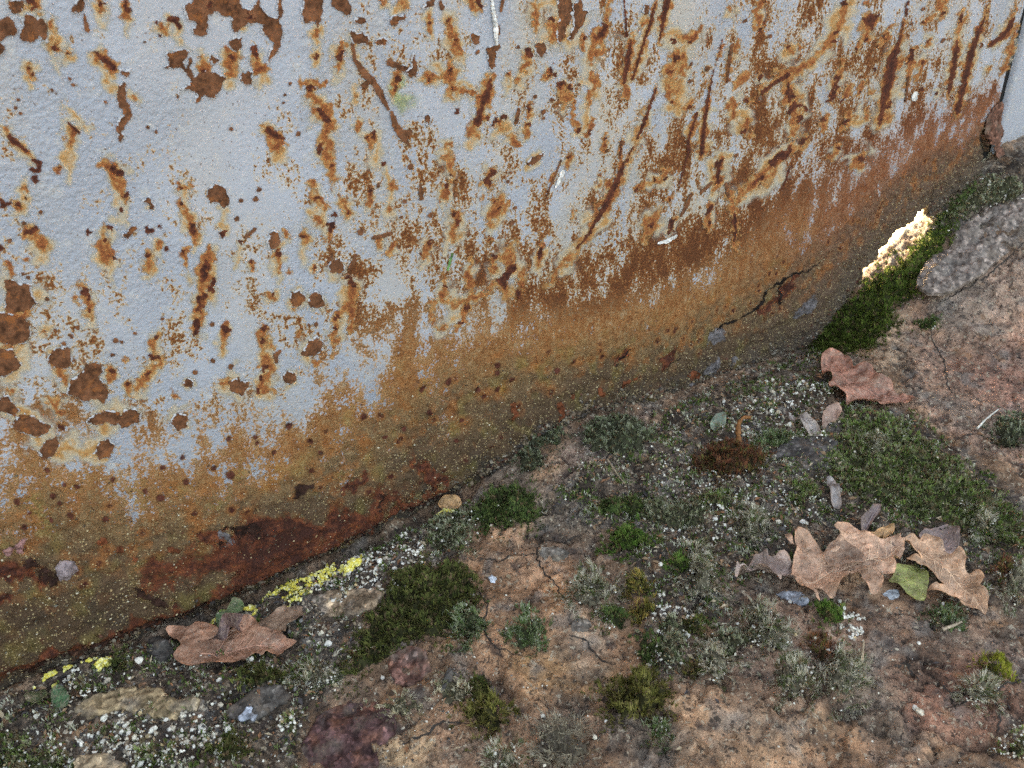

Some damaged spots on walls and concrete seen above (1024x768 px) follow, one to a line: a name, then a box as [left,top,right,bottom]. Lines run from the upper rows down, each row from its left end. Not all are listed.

peeling [163,0,284,104]
rust [140,36,424,402]
rust [387,0,625,339]
rust [659,24,710,118]
rust [632,150,742,257]
rust [722,0,950,173]
rust [980,101,1005,160]
rust [982,23,1020,76]
rust [0,105,167,465]
crack [717,265,818,330]
rust [168,388,191,431]
rust [0,455,457,676]